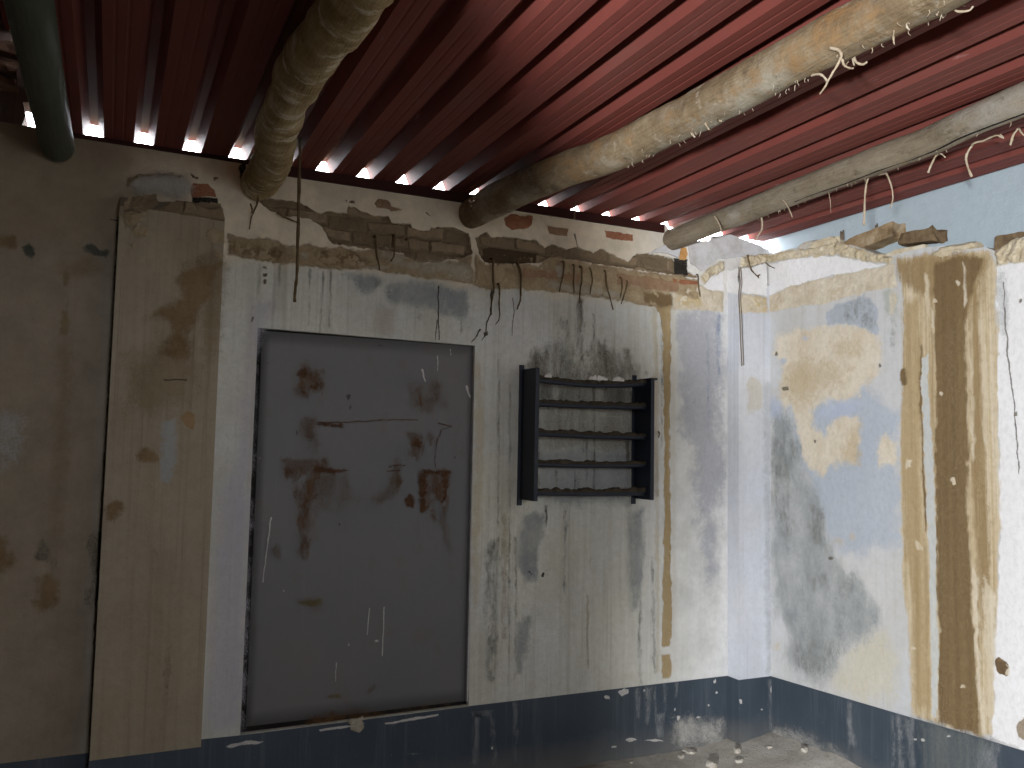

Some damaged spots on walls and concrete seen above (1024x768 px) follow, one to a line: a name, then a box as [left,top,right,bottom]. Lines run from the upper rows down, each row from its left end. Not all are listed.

flaking render [124,172,225,221]
flaking render [226,199,725,312]
flaking render [739,221,948,352]
flaking render [993,232,1024,268]
rust [281,415,454,561]
water stain [469,293,679,683]
water stain [761,249,1011,768]